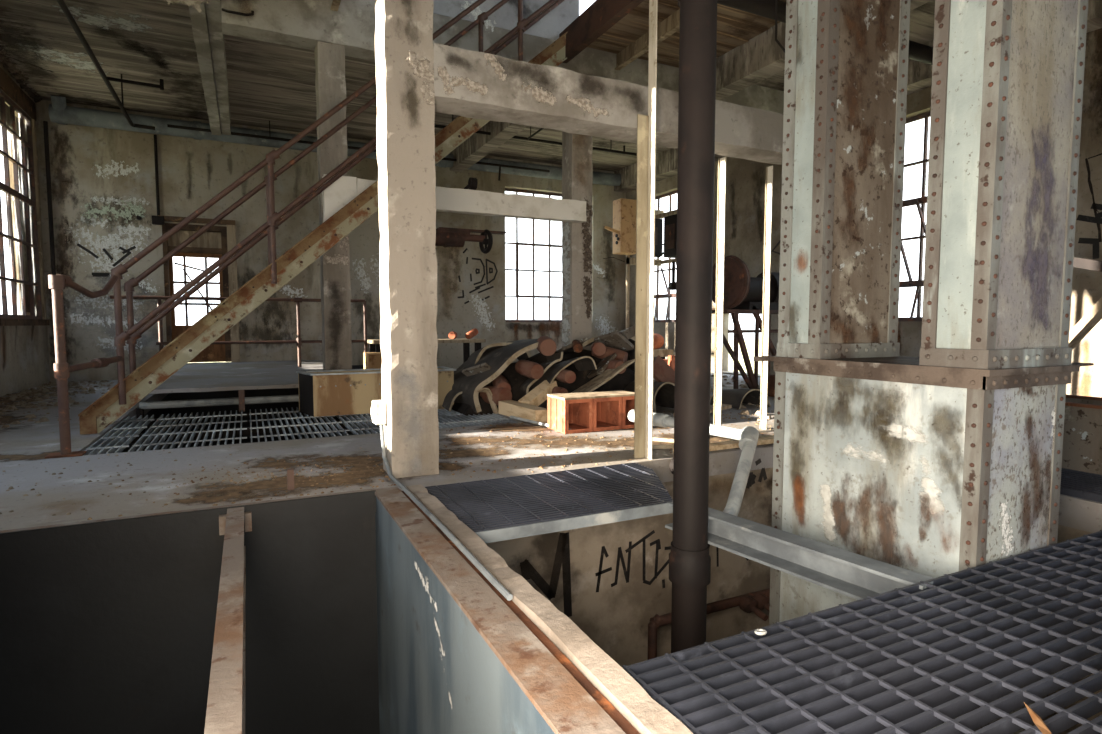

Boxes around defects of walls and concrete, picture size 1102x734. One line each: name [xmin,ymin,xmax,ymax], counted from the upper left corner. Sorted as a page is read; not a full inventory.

leakage [0,7,126,110]
leakage [53,5,207,119]
leakage [407,89,417,117]
leakage [448,56,469,66]
spalling [708,473,735,512]
spalling [738,468,773,527]
rust [795,478,804,525]
rust [832,483,902,566]
rust [932,409,960,494]
rust [1022,417,1051,544]
spalling [486,513,673,667]
spalling [706,545,770,643]